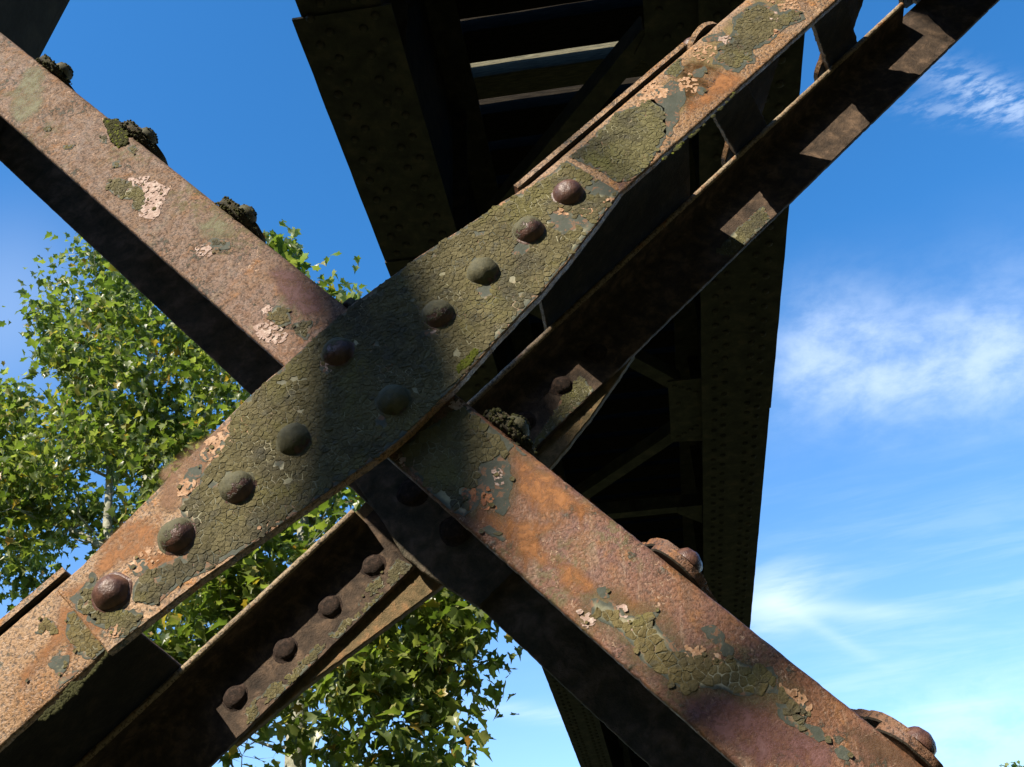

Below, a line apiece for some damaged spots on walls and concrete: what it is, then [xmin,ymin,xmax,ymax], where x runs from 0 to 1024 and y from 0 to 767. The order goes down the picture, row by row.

peeling [35,0,805,689]
corrosion [94,521,183,574]
corrosion [519,462,588,517]
peeling [576,586,854,761]